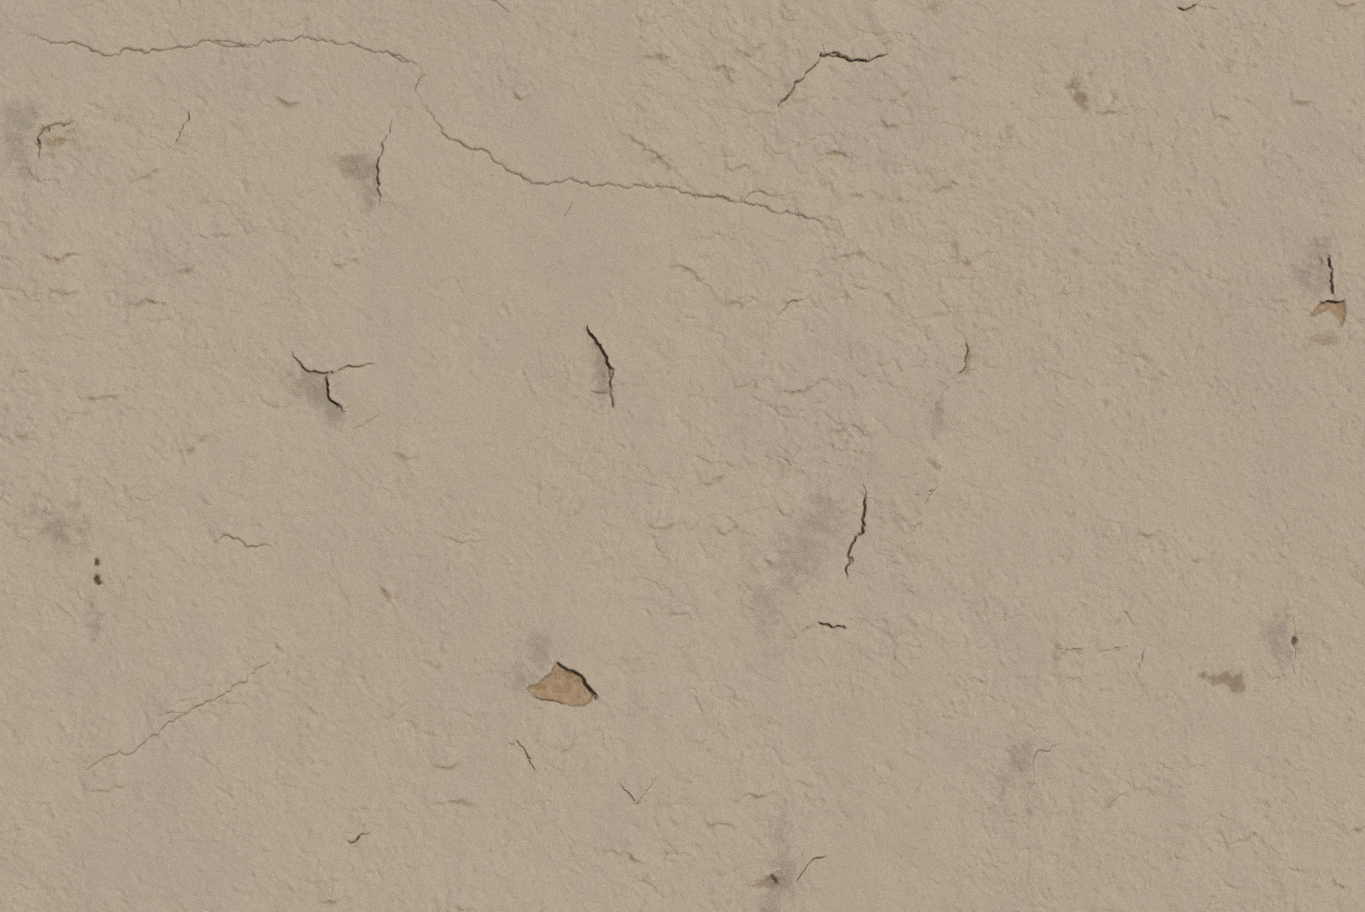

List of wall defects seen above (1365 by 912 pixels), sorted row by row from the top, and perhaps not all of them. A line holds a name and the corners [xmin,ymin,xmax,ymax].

peeling [768,0,894,119]
spalling [1310,257,1348,326]
peeling [292,350,377,412]
spalling [527,655,600,706]